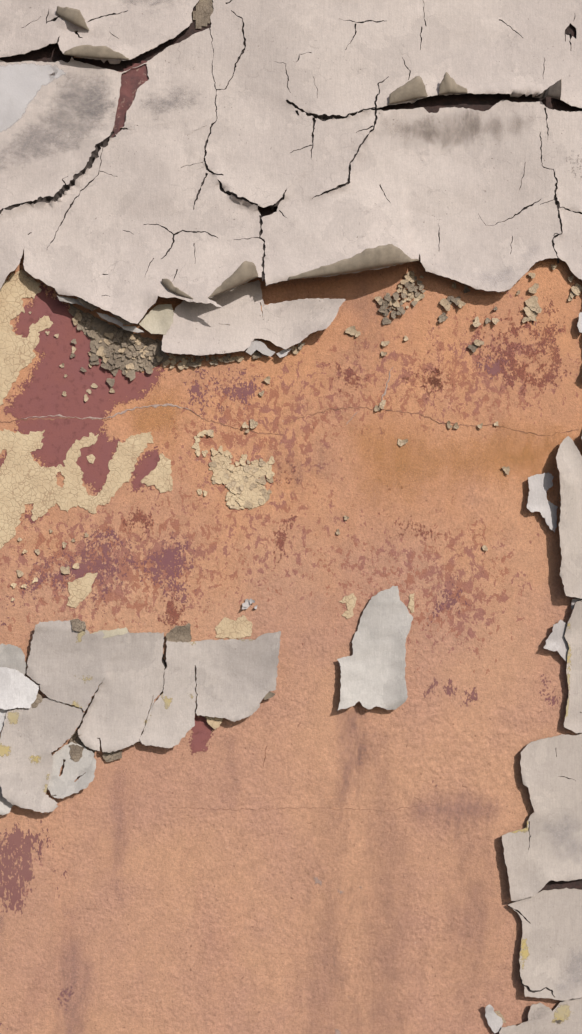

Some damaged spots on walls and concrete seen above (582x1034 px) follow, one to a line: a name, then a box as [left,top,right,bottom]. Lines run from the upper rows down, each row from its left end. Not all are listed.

peeling [0,63,65,132]
peeling [56,6,89,30]
peeling [64,45,129,59]
crack [0,0,286,281]
peeling [388,72,468,104]
crack [277,1,582,263]
peeling [534,79,562,100]
peeling [3,261,346,510]
peeling [288,244,426,325]
peeling [432,273,582,404]
peeling [0,504,281,915]
peeling [337,586,413,711]